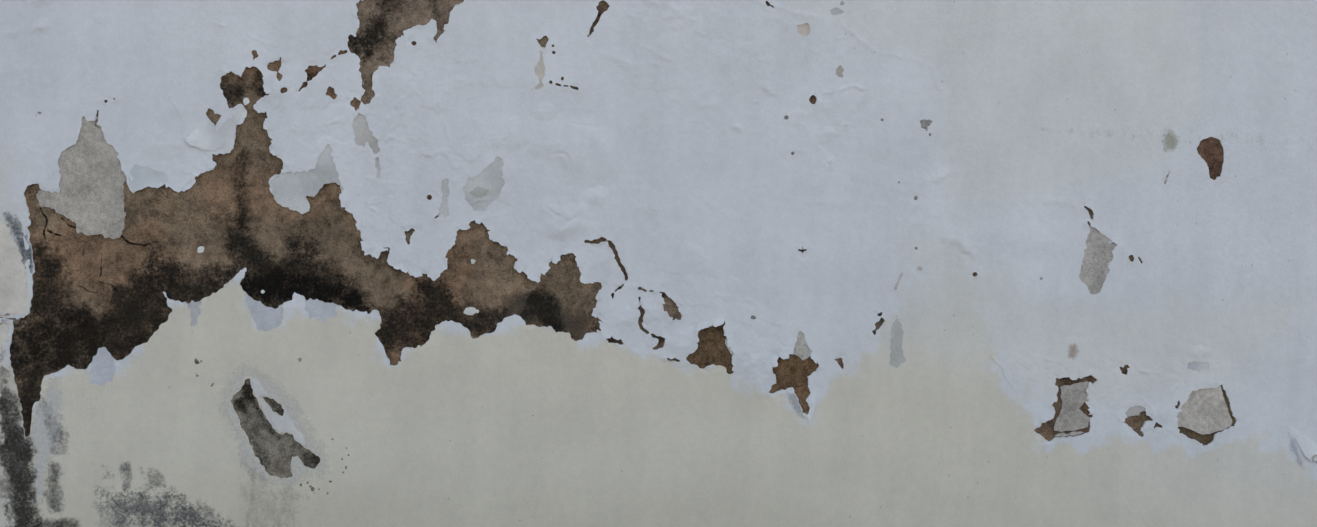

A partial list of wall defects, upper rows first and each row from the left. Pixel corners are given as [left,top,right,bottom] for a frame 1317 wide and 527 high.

leakage [348,0,392,62]
flaking render [587,0,609,37]
leakage [221,70,266,105]
flaking render [326,0,464,178]
flaking render [1197,137,1224,180]
flaking render [0,50,623,441]
peeling [1079,225,1117,295]
leakage [0,150,622,527]
flaking render [638,287,742,374]
flaking render [769,332,844,421]
flaking render [1034,371,1096,441]
flaking render [1119,385,1236,445]